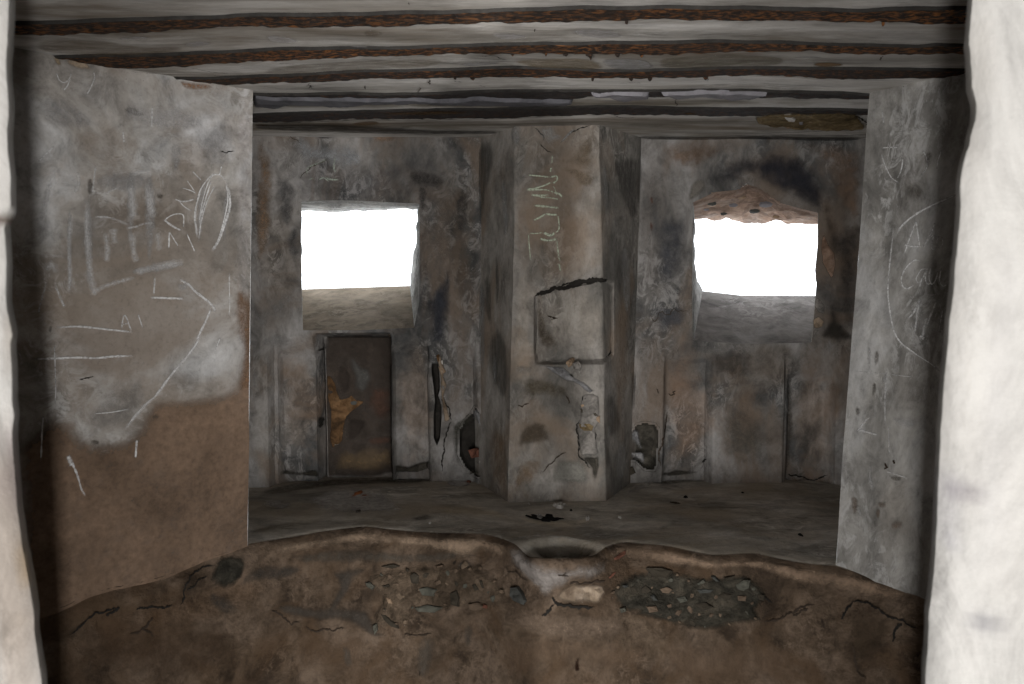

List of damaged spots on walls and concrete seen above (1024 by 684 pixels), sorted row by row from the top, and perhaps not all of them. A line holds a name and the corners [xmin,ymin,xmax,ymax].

crack [535,277,606,296]
rust [326,336,392,476]
spalling [432,354,481,479]
spalling [578,394,600,476]
spalling [630,421,689,476]